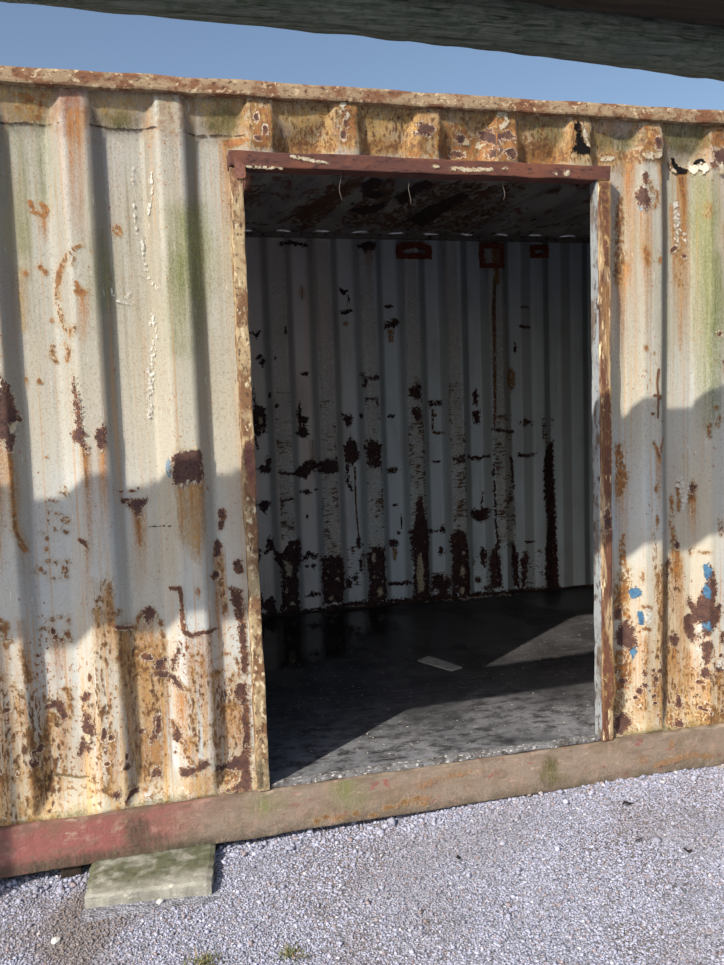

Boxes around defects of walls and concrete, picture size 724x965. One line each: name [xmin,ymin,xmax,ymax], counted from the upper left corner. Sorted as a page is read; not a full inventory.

rust [221,100,632,306]
peeling [581,122,724,228]
rust [339,287,355,326]
peeling [384,304,400,342]
rust [243,440,256,490]
peeling [252,377,559,613]
rust [603,389,629,504]
rust [0,616,83,825]
rust [87,579,170,794]
rust [602,495,724,737]